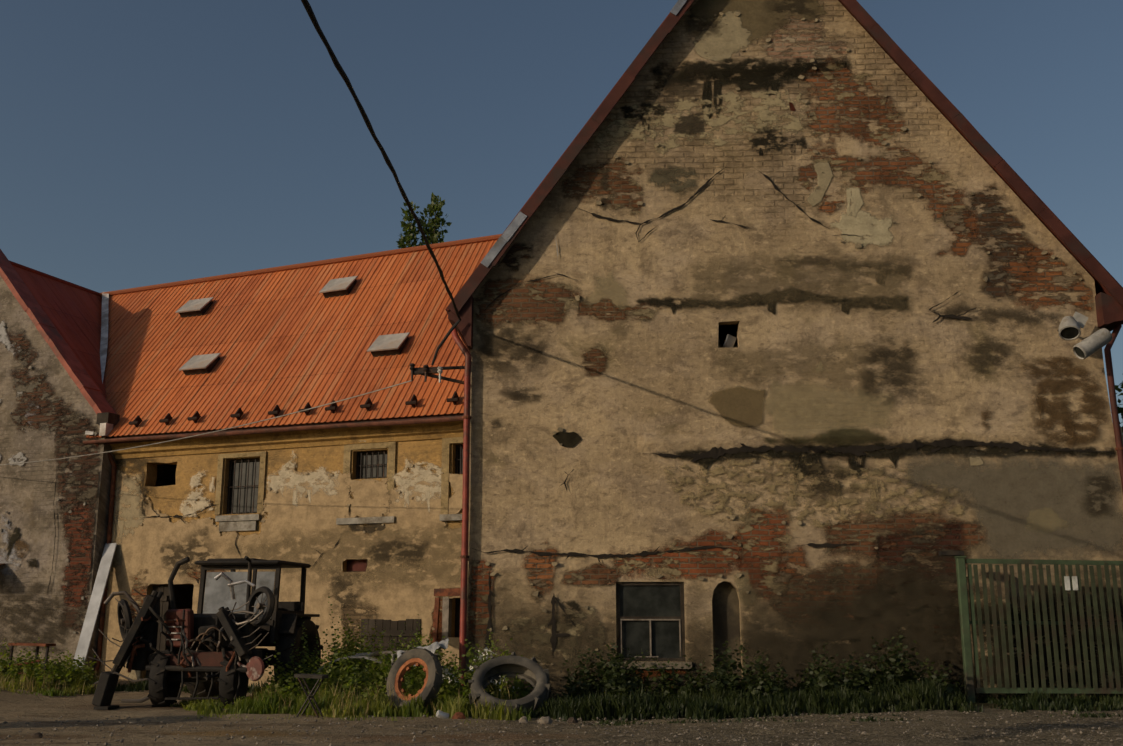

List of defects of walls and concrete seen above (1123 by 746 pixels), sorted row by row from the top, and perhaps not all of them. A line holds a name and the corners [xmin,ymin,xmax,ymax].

flaking render [561,11,1093,311]
crack [578,168,725,242]
crack [709,215,750,228]
crack [756,169,858,236]
flaking render [582,346,608,376]
spalling [552,427,581,447]
flaking render [0,321,100,634]
peeling [97,453,985,680]
crack [797,541,857,549]
peeling [248,666,274,687]